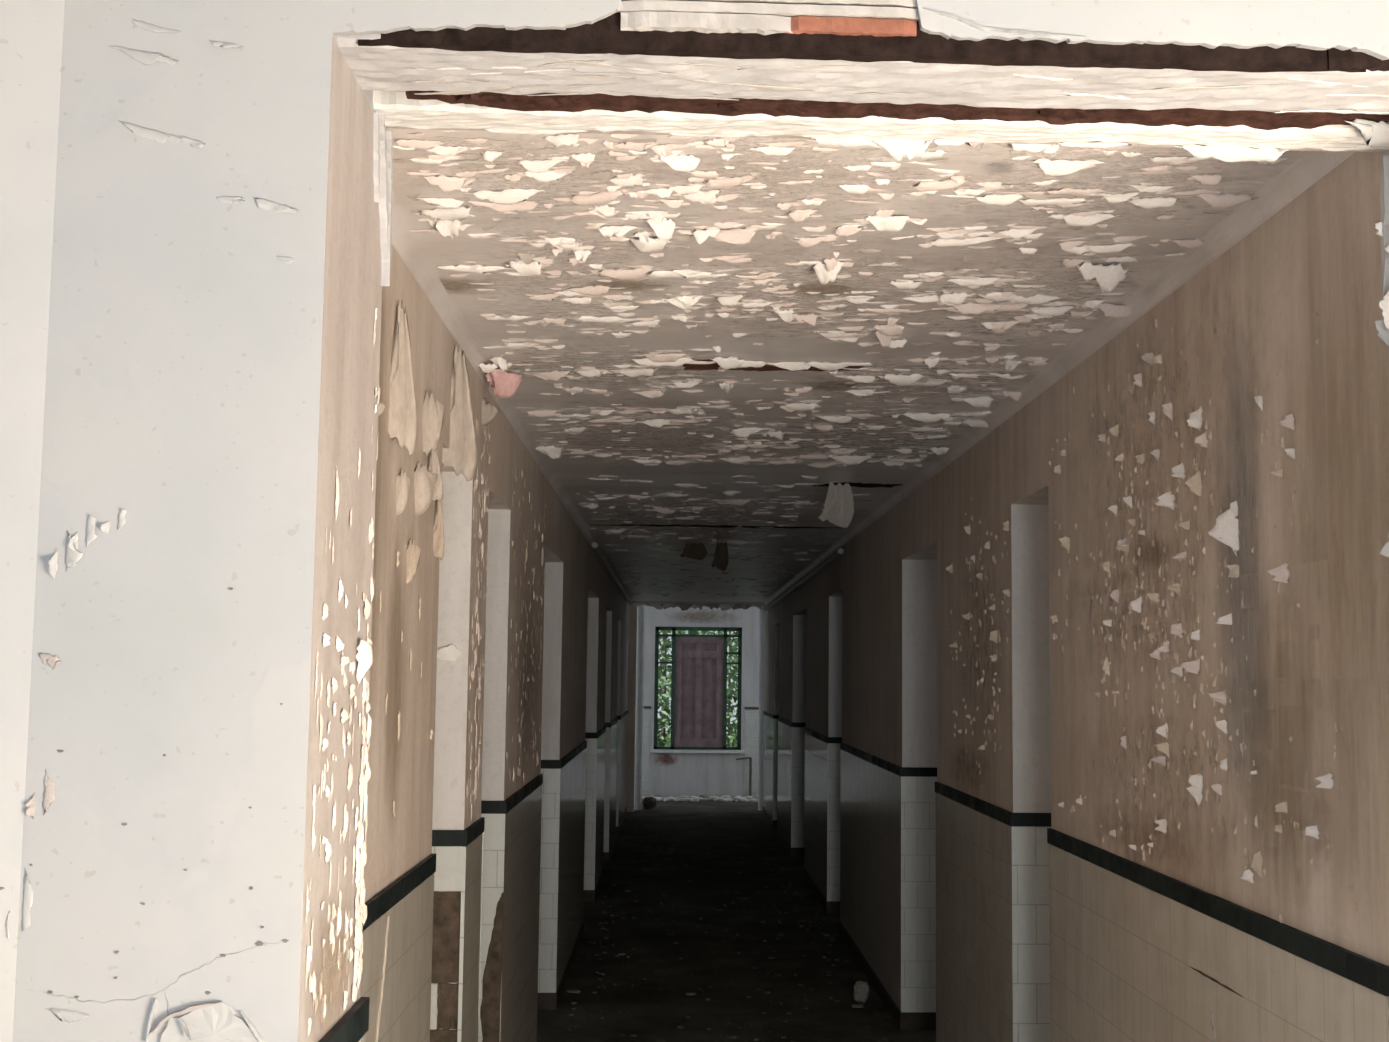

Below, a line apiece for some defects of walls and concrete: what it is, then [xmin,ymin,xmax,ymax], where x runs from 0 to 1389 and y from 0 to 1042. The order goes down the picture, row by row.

peeling [407,58,854,100]
peeling [1005,74,1389,346]
peeling [325,471,374,563]
peeling [358,113,1291,862]
peeling [1261,413,1308,529]
peeling [305,577,401,1038]
peeling [1234,801,1333,883]
peeling [1315,722,1343,795]
crack [27,939,289,1014]
spalling [430,891,461,1042]
spalling [480,892,504,1042]
crack [1191,967,1243,1042]